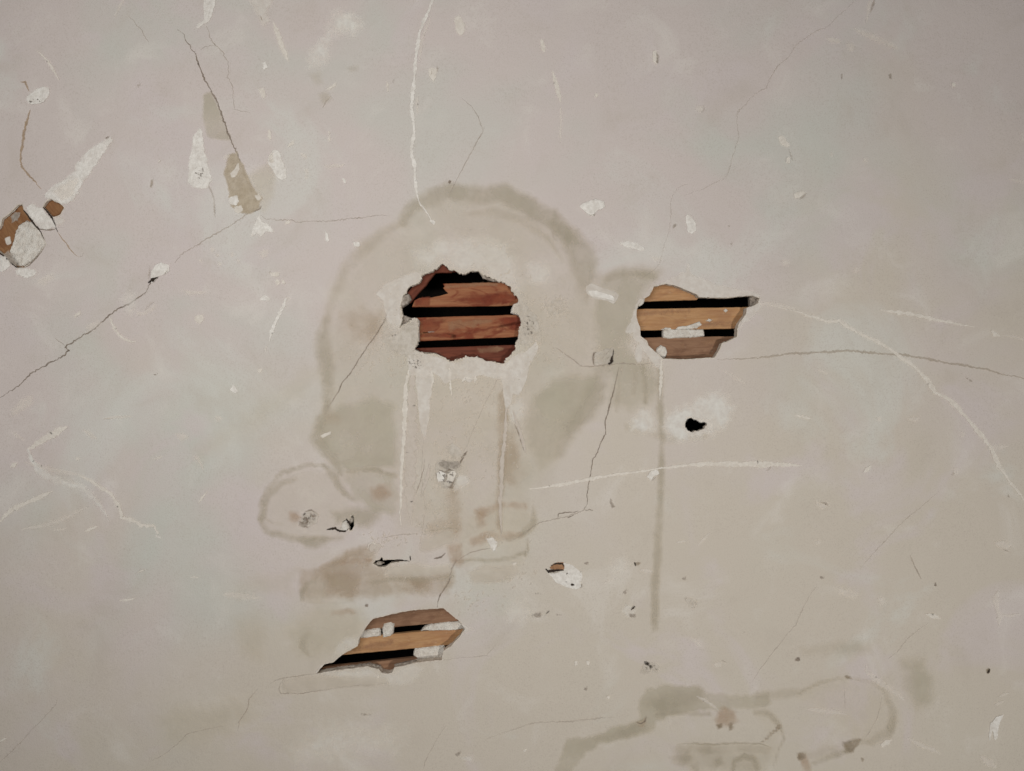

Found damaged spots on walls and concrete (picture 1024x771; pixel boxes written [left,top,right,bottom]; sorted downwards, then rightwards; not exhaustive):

crack [180,31,240,161]
crack [0,81,77,268]
crack [1,283,151,397]
spalling [359,263,571,525]
spalling [626,266,761,399]
spalling [666,394,730,440]
crack [737,350,1024,379]
spalling [545,562,583,589]
spalling [315,604,471,685]